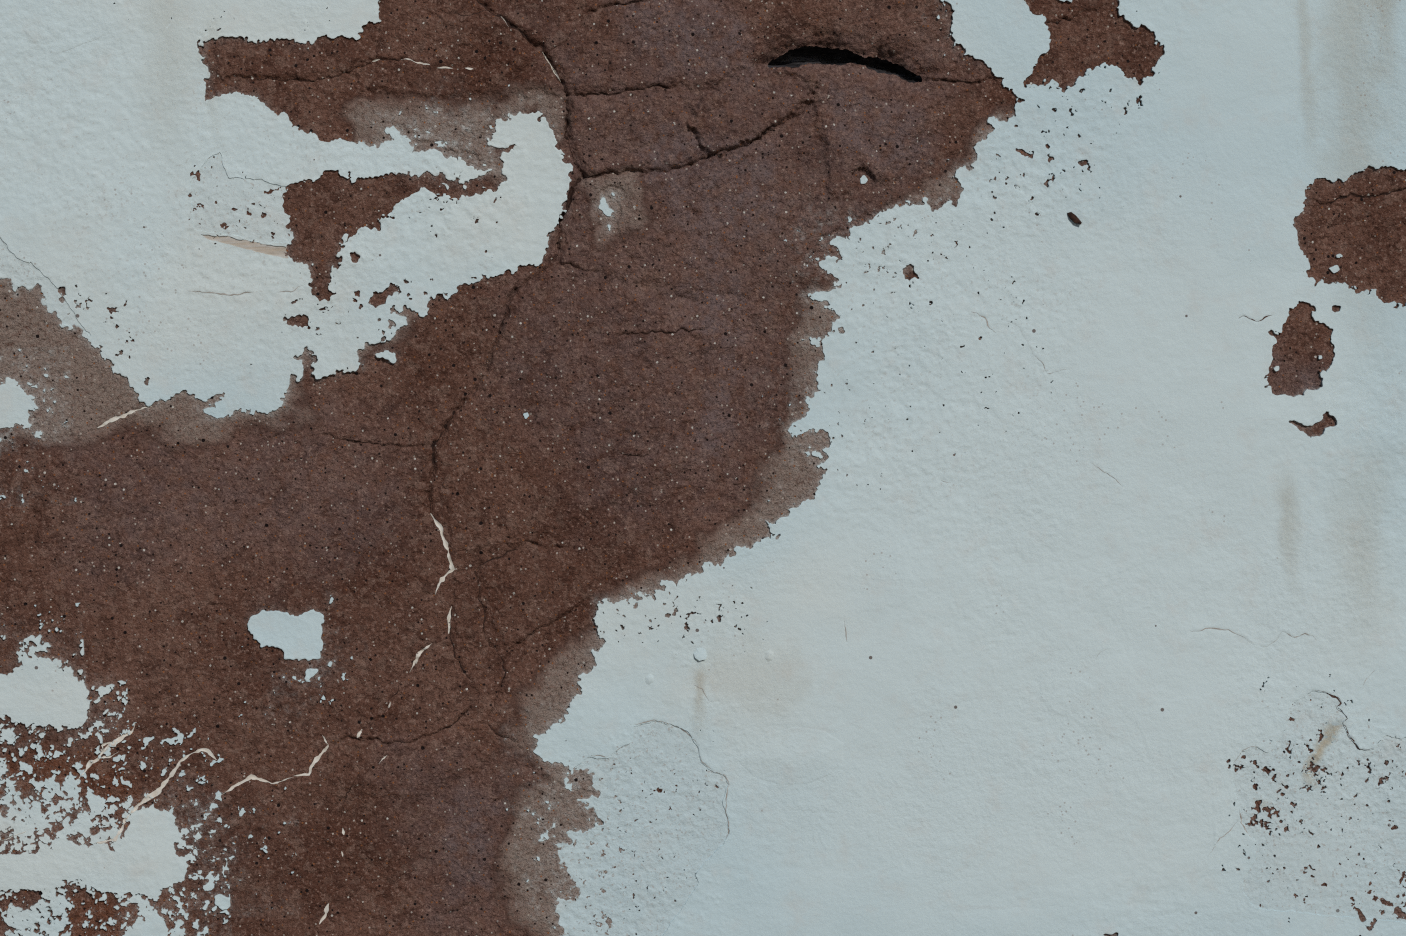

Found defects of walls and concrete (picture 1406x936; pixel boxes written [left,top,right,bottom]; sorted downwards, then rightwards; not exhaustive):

crack [930,77,990,85]
peeling [1023,0,1164,115]
peeling [1016,130,1092,188]
peeling [1293,166,1406,309]
peeling [1264,301,1340,397]
crack [96,0,806,856]
peeling [0,0,1025,936]
peeling [1289,411,1336,438]
crack [319,904,329,924]